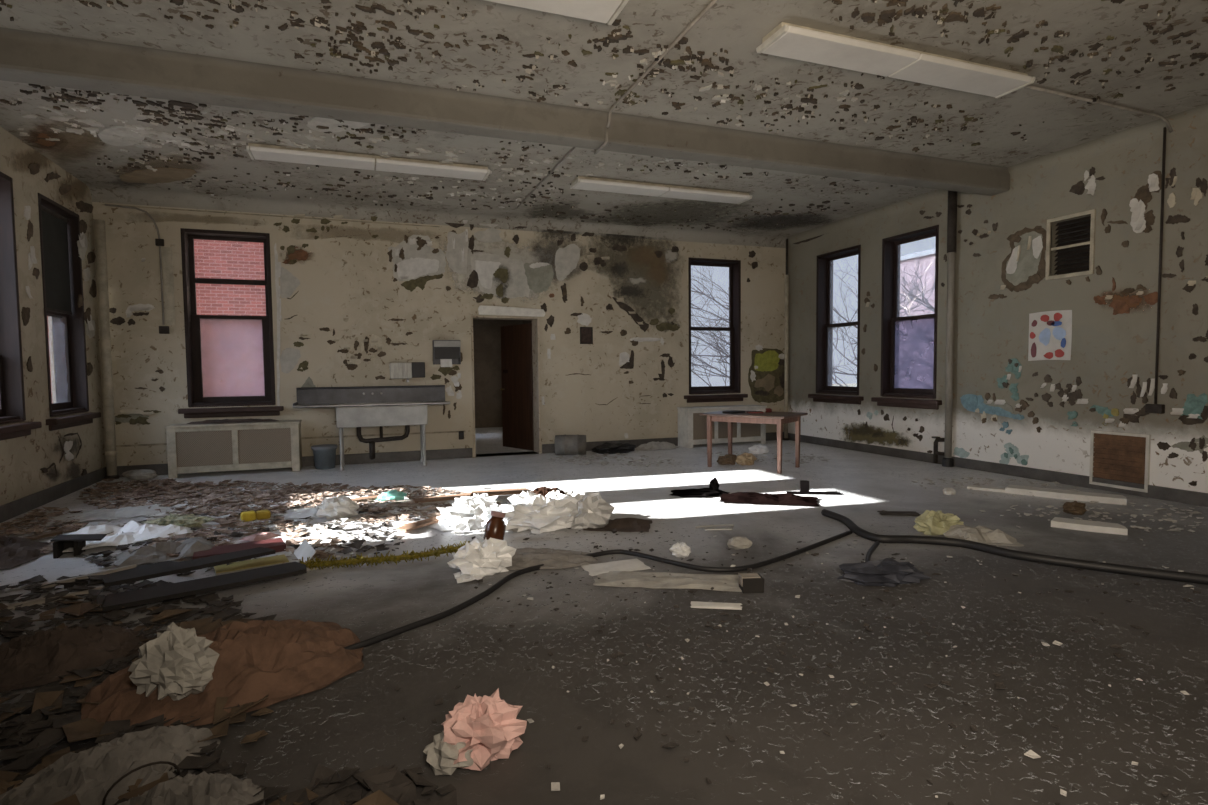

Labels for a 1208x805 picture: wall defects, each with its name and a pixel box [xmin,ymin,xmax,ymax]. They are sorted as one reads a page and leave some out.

peeling [158,0,267,29]
peeling [265,0,509,74]
peeling [502,19,983,154]
peeling [832,0,1208,101]
damp [15,122,104,210]
flaking render [0,84,768,338]
damp [453,201,826,332]
peeling [958,220,1047,299]
peeling [1069,167,1105,195]
peeling [1101,167,1208,315]
peeling [601,329,677,398]
peeling [960,330,1208,465]